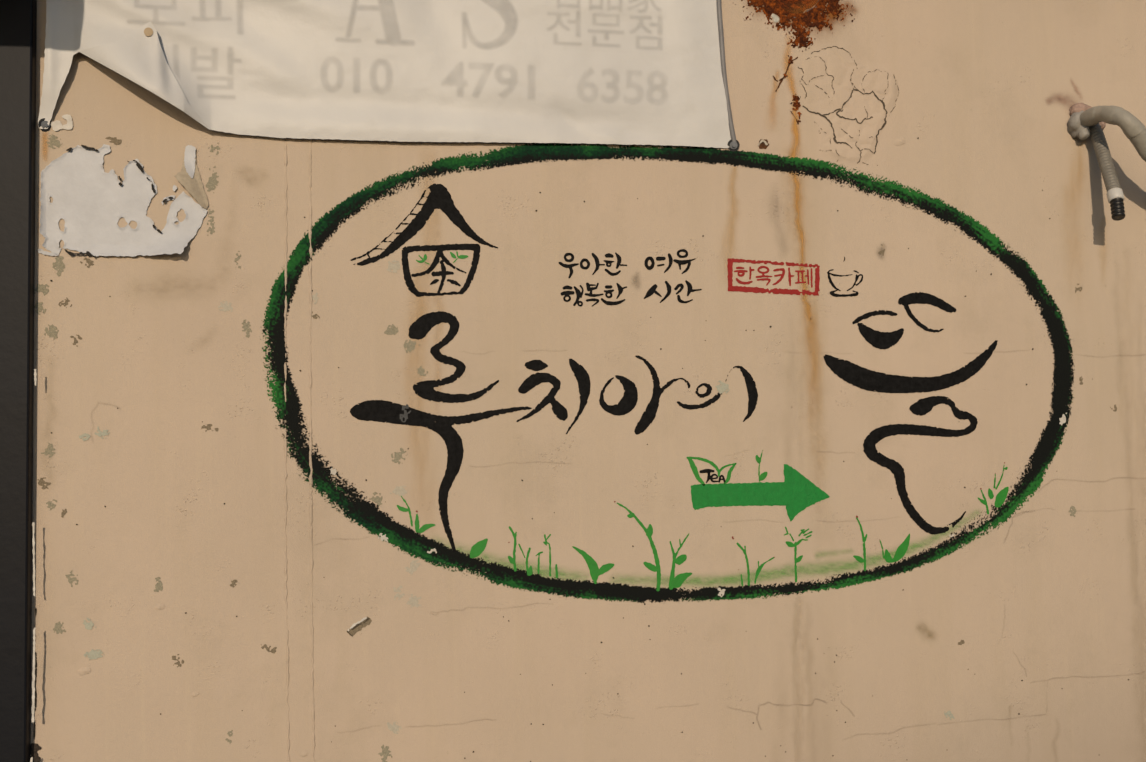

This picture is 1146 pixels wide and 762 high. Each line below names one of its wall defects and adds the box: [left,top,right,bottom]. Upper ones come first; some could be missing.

peeling [34,134,220,347]
rust [735,0,855,321]